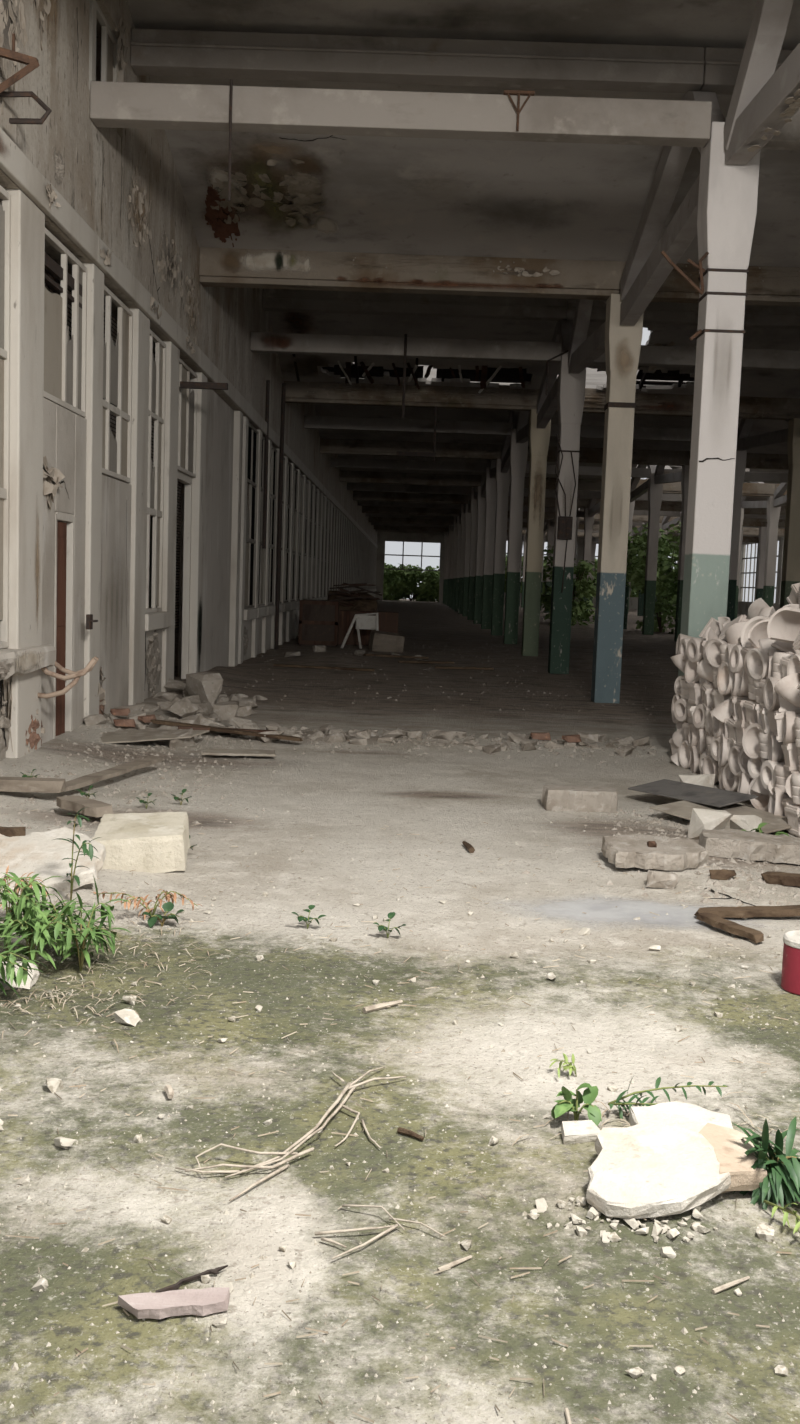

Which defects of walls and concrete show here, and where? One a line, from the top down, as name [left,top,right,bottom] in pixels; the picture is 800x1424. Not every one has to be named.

peeling [204,159,326,247]
spalling [0,659,45,761]